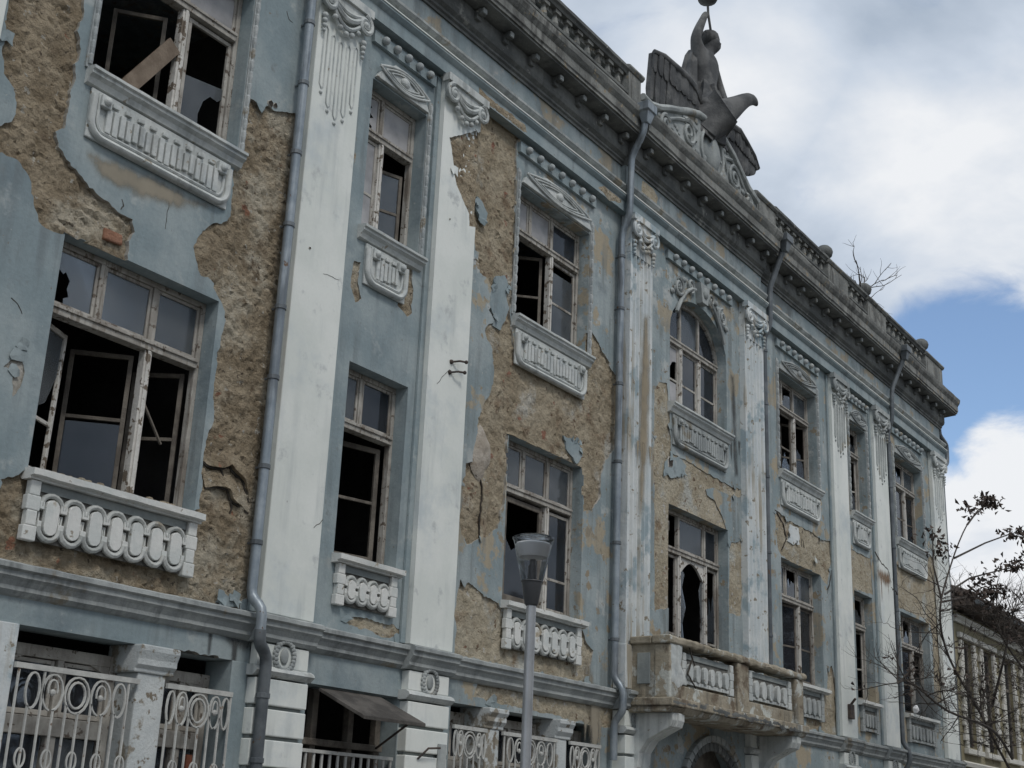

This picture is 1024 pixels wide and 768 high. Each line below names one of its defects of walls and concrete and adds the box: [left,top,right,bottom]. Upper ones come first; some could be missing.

peeling [256,99,278,113]
water stain [95,157,185,206]
peeling [475,196,488,226]
peeling [490,275,512,331]
peeling [654,451,687,478]
crack [202,447,257,514]
peeling [776,515,800,545]
crack [776,511,805,551]
peeling [216,589,242,609]